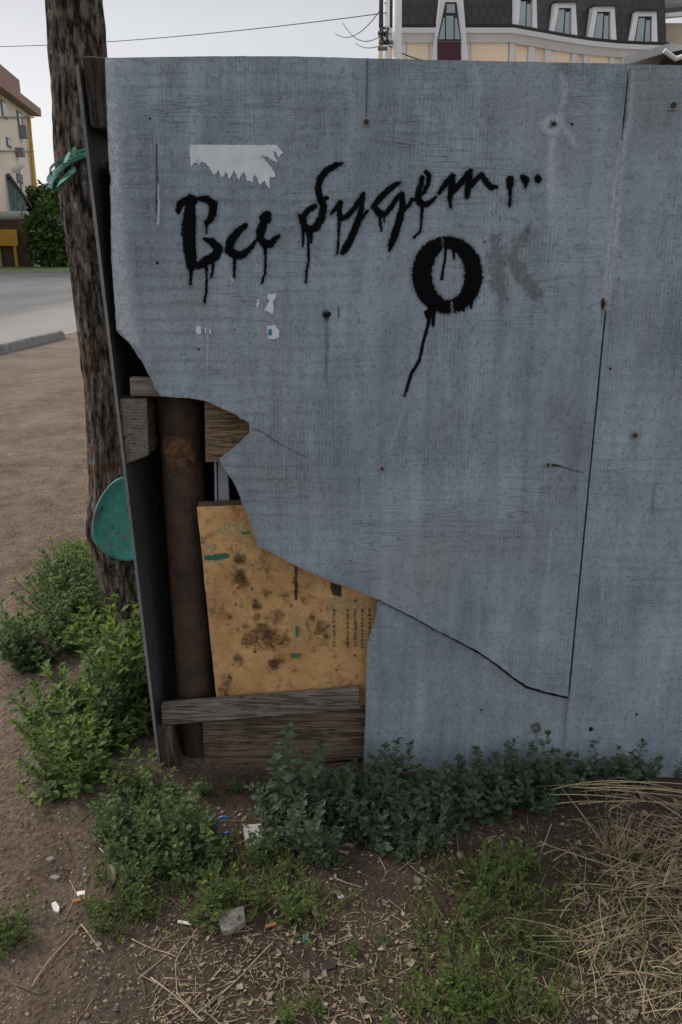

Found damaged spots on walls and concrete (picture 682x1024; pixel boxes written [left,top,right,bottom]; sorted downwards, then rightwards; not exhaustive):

crack [378,600,568,698]